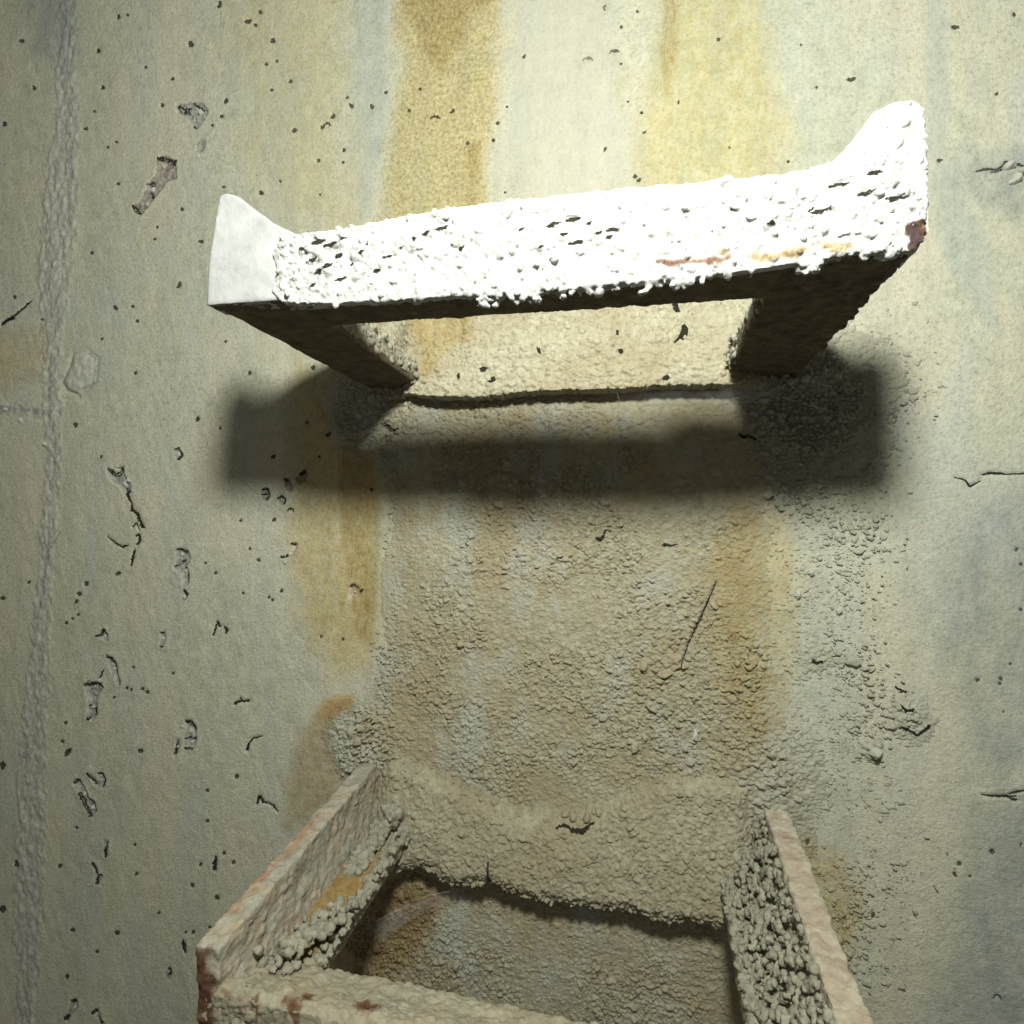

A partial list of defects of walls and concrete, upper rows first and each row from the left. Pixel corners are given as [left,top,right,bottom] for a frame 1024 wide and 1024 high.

spalling [175,102,208,158]
spalling [132,155,177,215]
water stain [272,100,930,309]
crack [976,160,1024,185]
rust [906,220,925,249]
crack [955,472,1024,487]
crack [107,487,145,567]
spalling [174,548,190,600]
crack [681,582,716,667]
spalling [83,655,121,721]
spalling [73,772,107,818]
crack [981,790,1024,801]